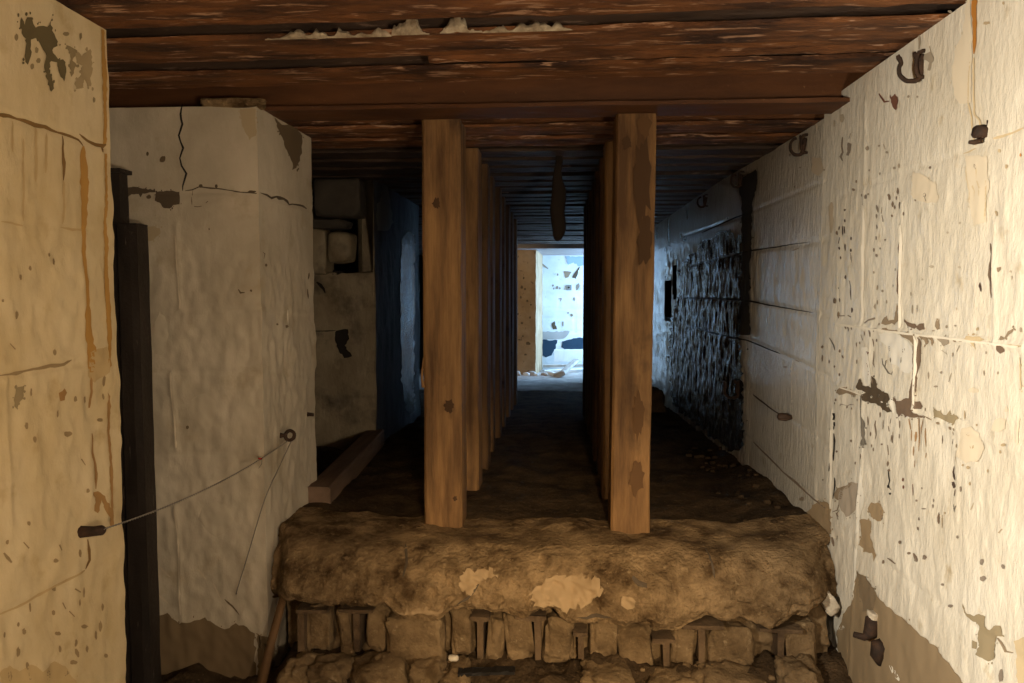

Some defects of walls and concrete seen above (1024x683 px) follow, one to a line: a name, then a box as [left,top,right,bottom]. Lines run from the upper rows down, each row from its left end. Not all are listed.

crack [178,104,307,209]
spalling [275,118,304,172]
rust [80,29,112,408]
spalling [335,329,352,358]
peeling [821,271,989,473]
spalling [948,604,1004,682]